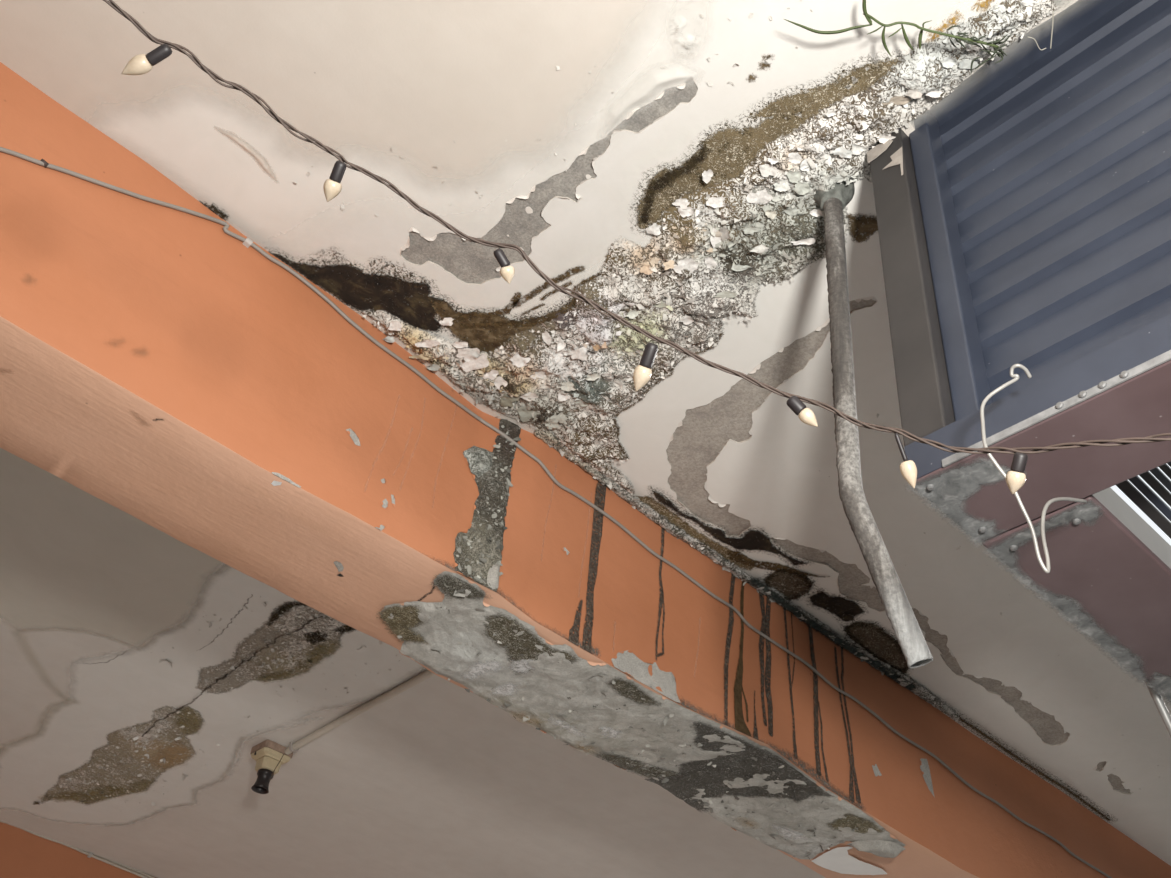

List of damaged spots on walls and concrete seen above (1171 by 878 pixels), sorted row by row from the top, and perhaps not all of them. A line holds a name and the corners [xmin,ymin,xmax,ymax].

damp [95,0,1006,354]
spalling [271,472,301,488]
peeling [346,428,360,446]
flaking render [360,0,1070,875]
damp [534,163,1171,866]
crack [142,616,323,737]
flaking render [198,601,356,693]
flaking render [34,706,203,805]
peeling [1093,761,1133,795]